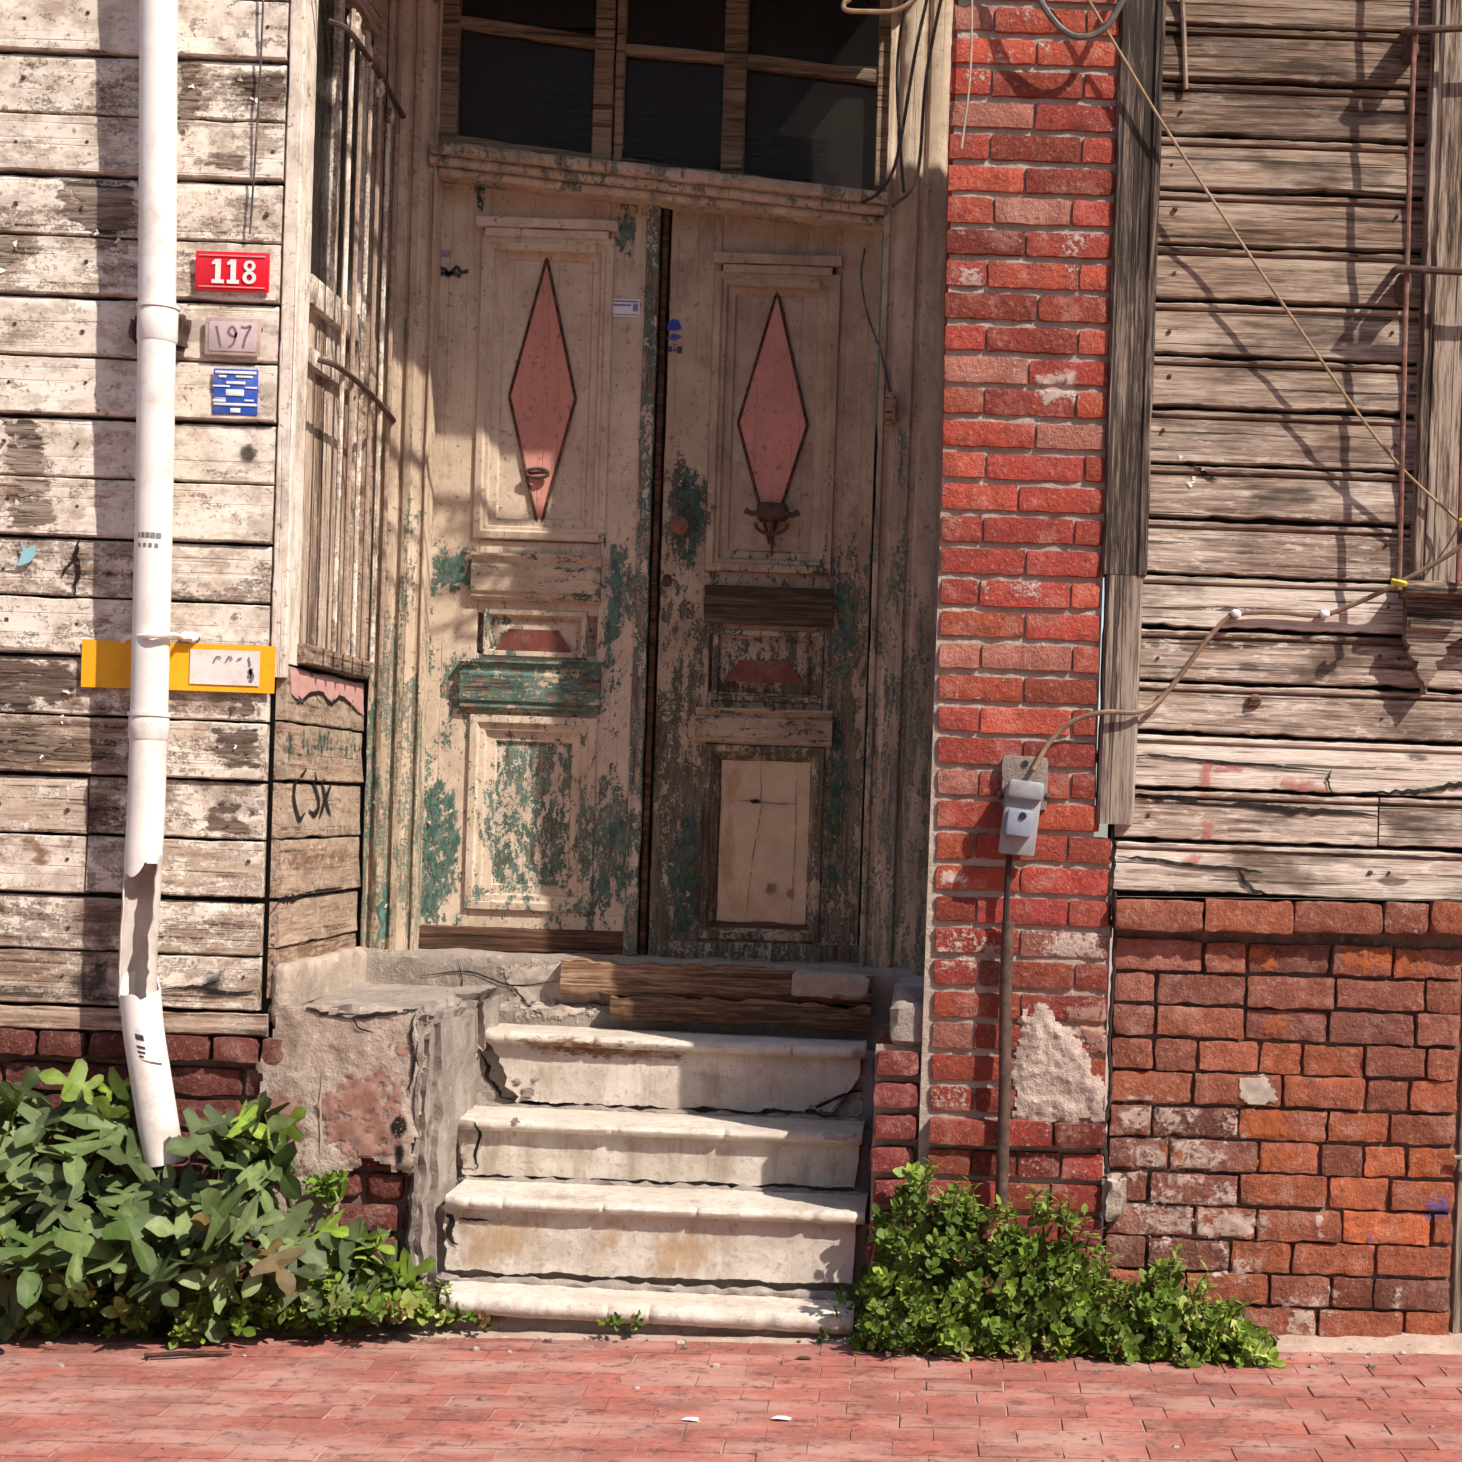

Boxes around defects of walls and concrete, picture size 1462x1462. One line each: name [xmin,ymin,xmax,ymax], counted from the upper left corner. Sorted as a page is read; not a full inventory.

peeling [177,51,250,170]
peeling [55,178,137,264]
peeling [3,419,60,527]
peeling [433,544,472,594]
crack [1135,754,1462,818]
peeling [421,778,465,914]
spalling [269,1069,417,1179]
crack [302,959,602,1094]
spalling [457,1092,490,1170]
crack [481,1054,587,1105]
crack [1097,827,1268,1175]
crack [446,1213,489,1245]